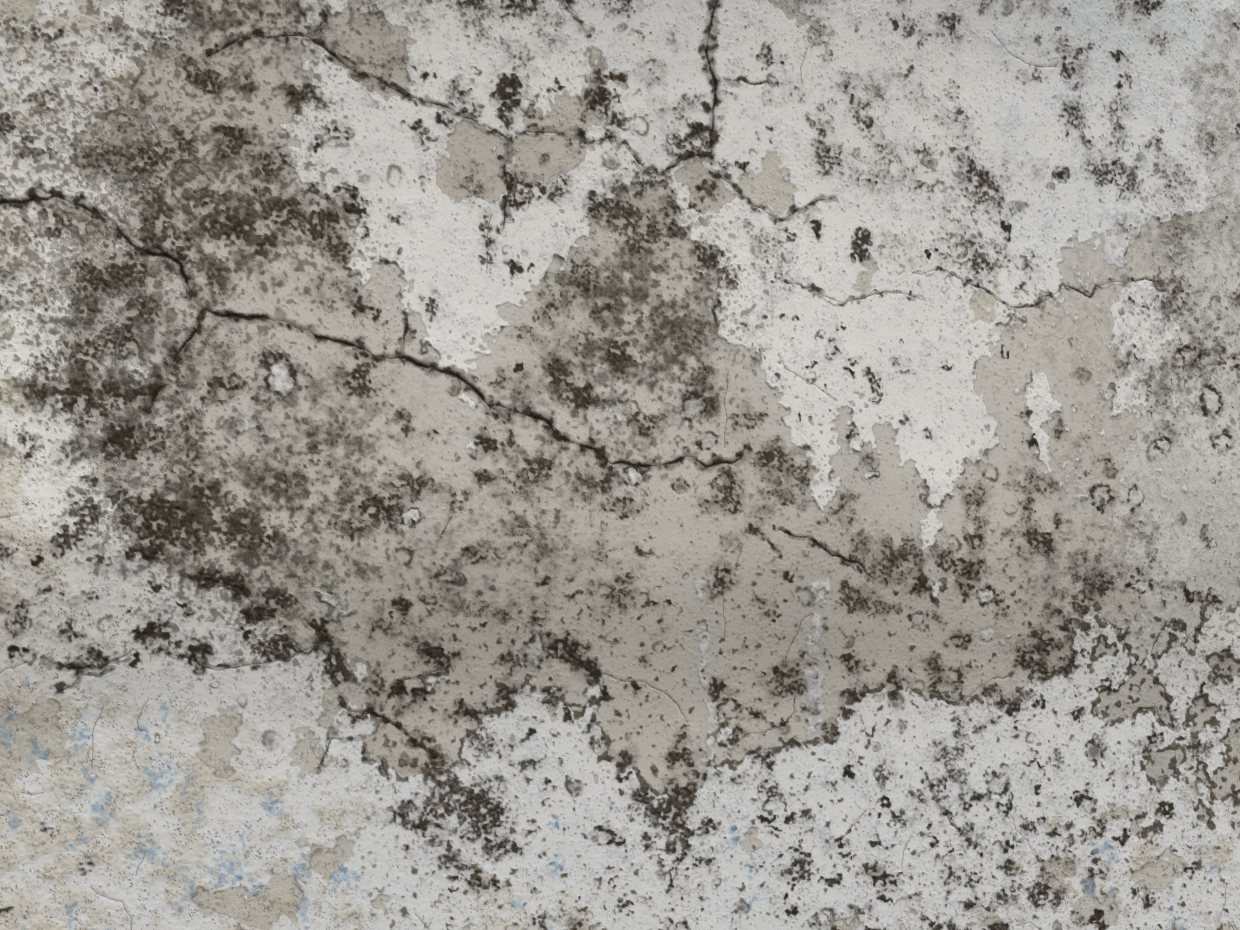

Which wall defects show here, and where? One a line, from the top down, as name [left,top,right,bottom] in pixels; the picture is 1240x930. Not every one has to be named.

crack [206,0,823,224]
peeling [435,47,628,203]
peeling [674,157,735,219]
damp [0,98,369,659]
crack [0,183,751,473]
crack [784,279,912,306]
crack [936,266,1152,308]
damp [389,729,540,893]
damp [608,621,745,930]
damp [760,614,1130,930]
peeling [1091,663,1177,730]
peeling [1142,719,1240,827]